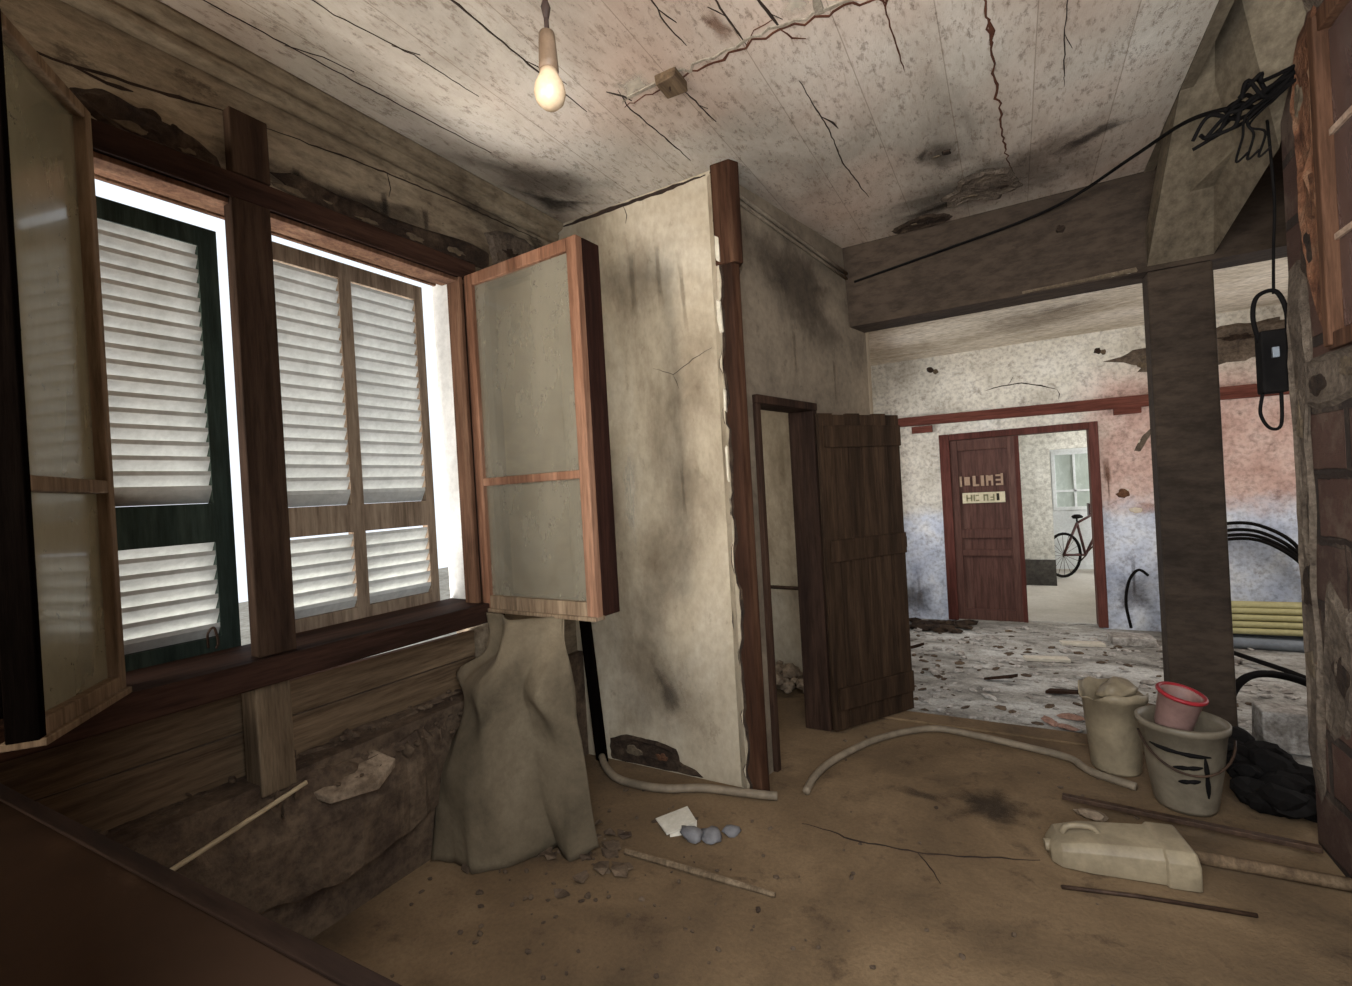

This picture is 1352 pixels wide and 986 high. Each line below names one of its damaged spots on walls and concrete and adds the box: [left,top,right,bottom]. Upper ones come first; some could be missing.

spalling [69,87,221,168]
crack [267,0,905,241]
crack [984,0,1011,167]
crack [1063,0,1072,85]
water stain [1073,125,1115,145]
crack [802,823,1037,884]